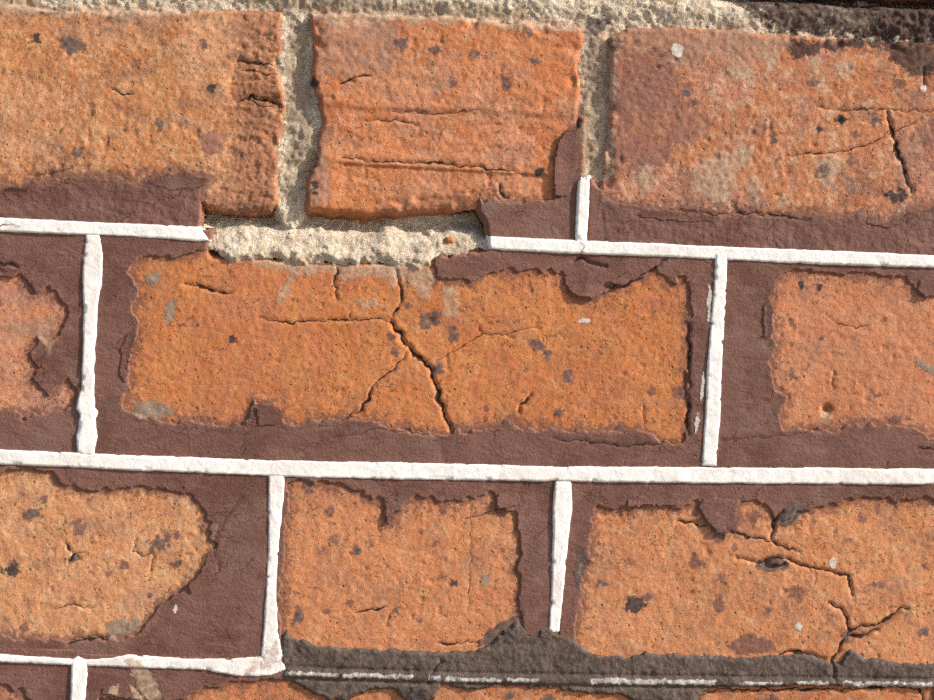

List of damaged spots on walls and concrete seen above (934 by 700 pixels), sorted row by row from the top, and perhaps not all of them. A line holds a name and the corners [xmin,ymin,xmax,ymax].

crack [788,106,934,191]
peeling [0,266,77,421]
crack [259,266,538,438]
peeling [119,245,692,444]
peeling [763,269,934,438]
peeling [0,468,220,641]
peeling [278,479,523,653]
peeling [575,496,934,665]
crack [678,511,923,700]